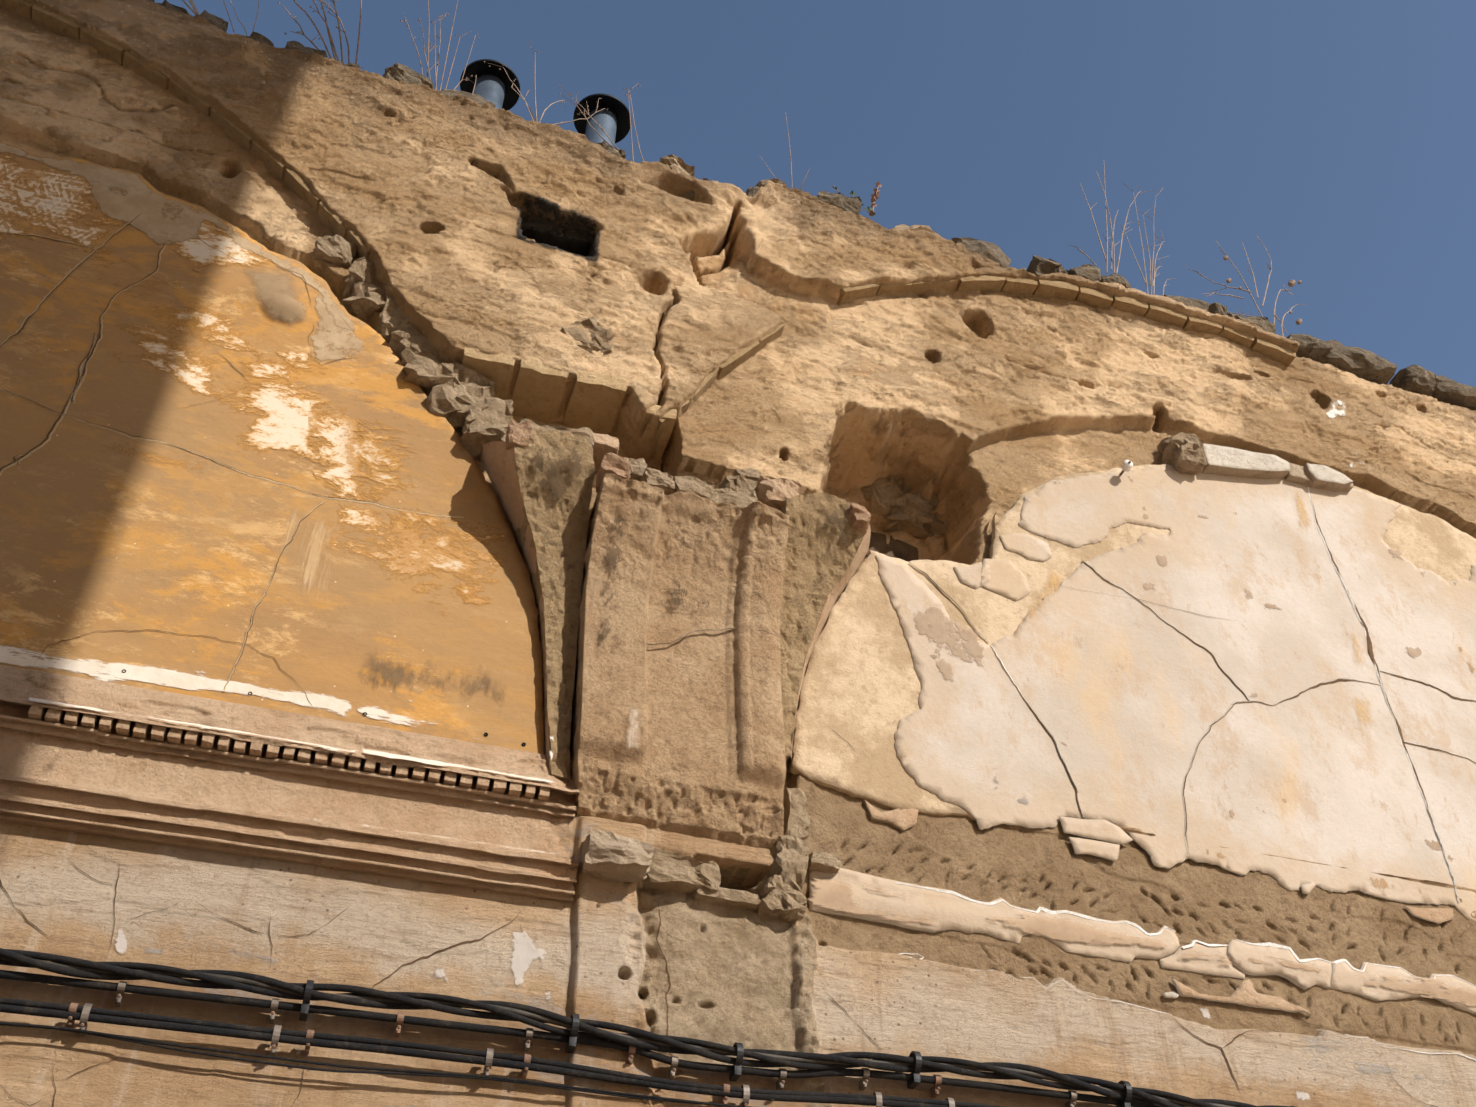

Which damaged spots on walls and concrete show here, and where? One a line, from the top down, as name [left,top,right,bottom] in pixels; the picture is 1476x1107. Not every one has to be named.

peeling [0,143,363,361]
crack [0,208,463,711]
crack [909,562,1084,818]
crack [1050,487,1476,903]
flaking render [864,800,919,831]
flaking render [1059,816,1133,861]
flaking render [808,868,1476,1030]